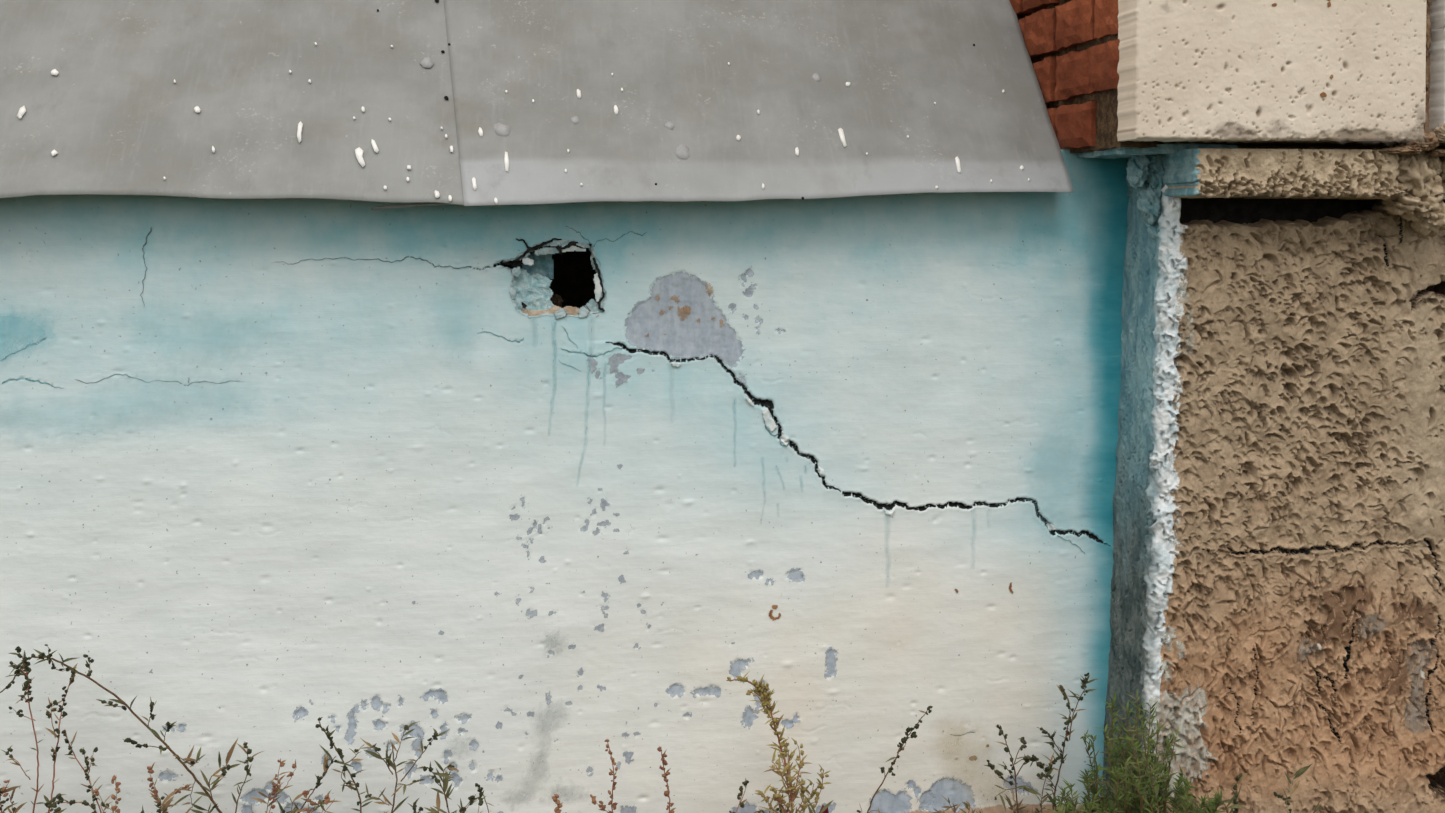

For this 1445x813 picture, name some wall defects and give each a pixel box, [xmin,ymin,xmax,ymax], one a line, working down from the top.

spalling [494,238,607,319]
peeling [587,269,786,388]
spalling [1410,281,1445,308]
crack [558,327,1110,554]
peeling [509,497,550,563]
peeling [580,488,619,535]
peeling [654,642,754,717]
peeling [825,647,838,677]
crack [1202,538,1441,744]
peeling [328,688,502,787]
peeling [869,776,975,813]
spalling [1426,767,1445,800]